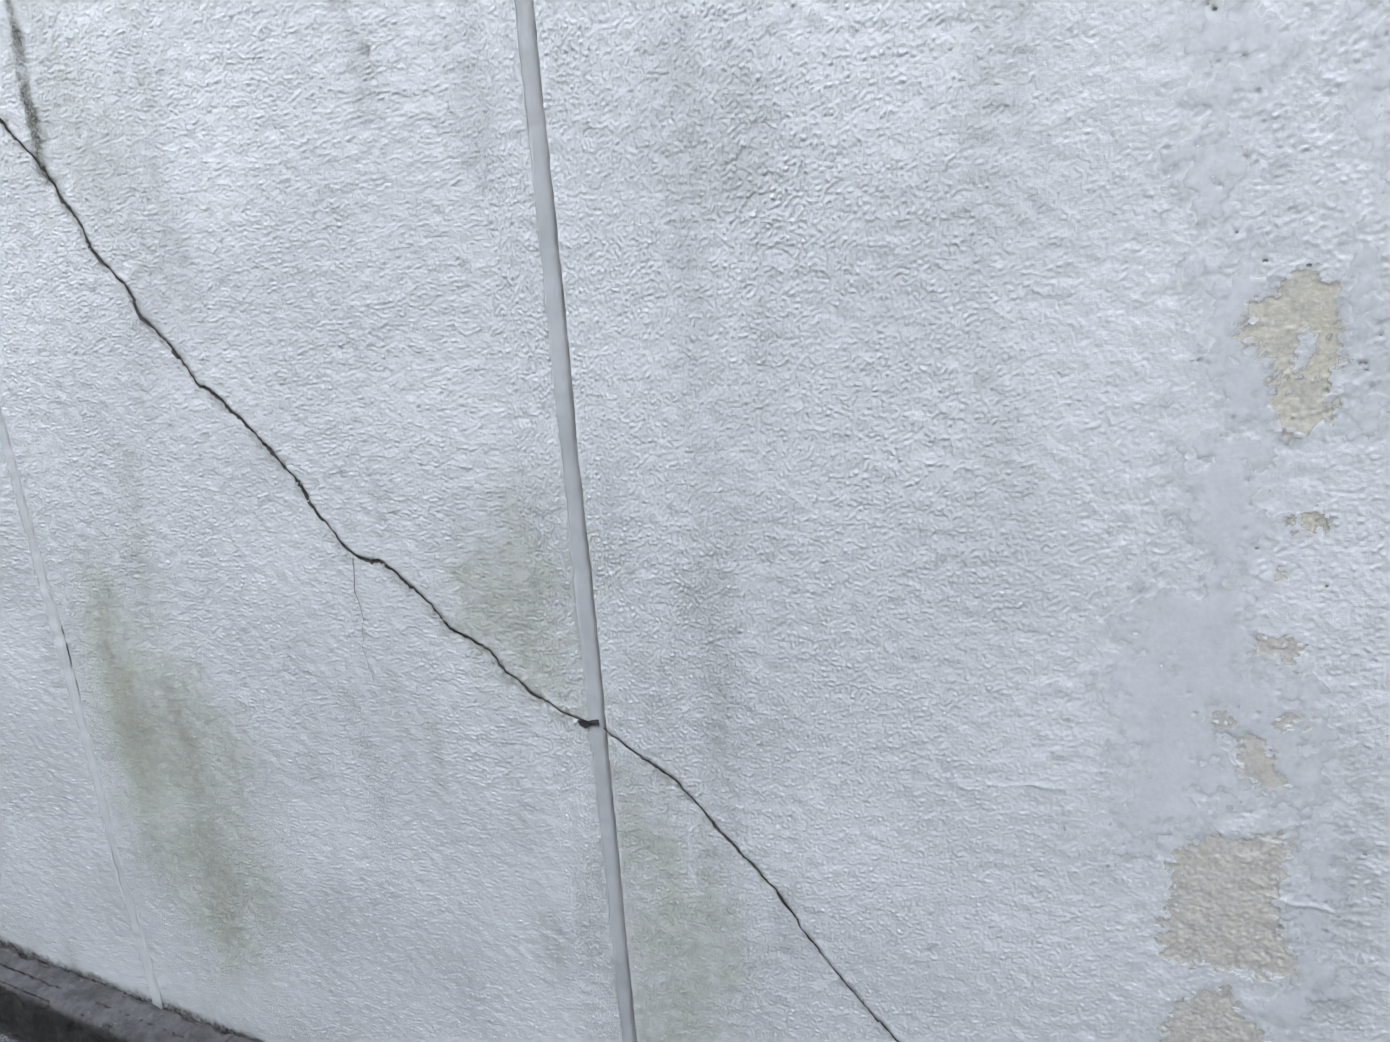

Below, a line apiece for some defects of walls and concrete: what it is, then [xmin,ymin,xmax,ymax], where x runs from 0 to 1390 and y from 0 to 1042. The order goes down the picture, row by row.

peeling [1232,263,1372,441]
crack [0,118,899,1042]
water stain [0,941,262,1042]
peeling [1154,829,1300,1042]